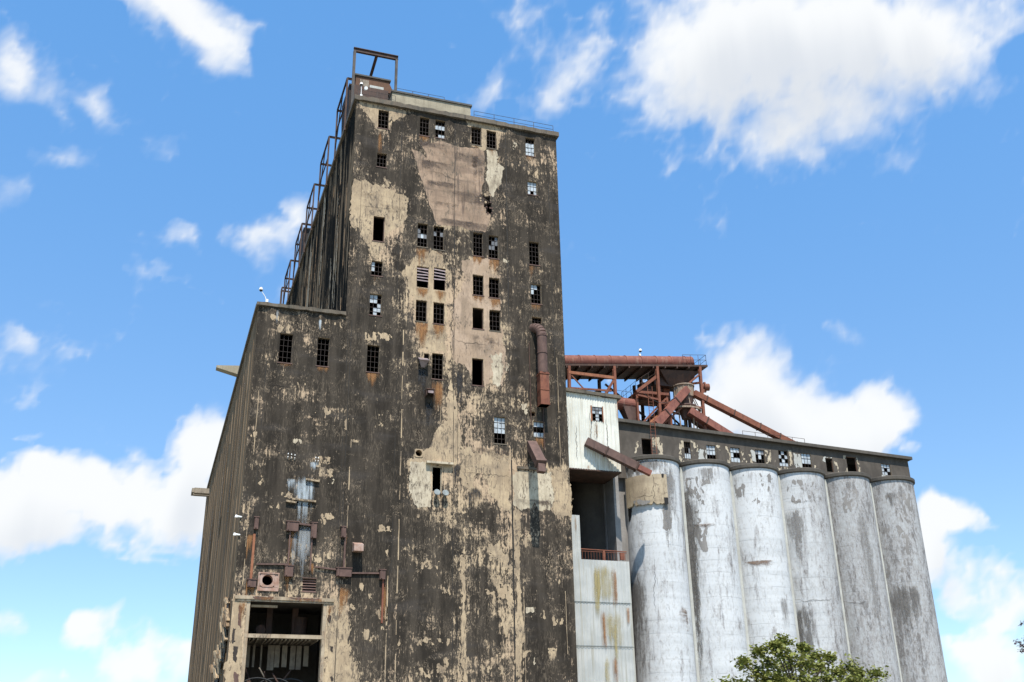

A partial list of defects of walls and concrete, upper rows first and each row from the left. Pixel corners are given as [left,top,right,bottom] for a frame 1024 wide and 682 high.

peeling [411,121,504,232]
peeling [306,178,409,309]
peeling [407,380,572,682]
peeling [635,437,663,455]
peeling [679,441,860,552]
leakage [787,513,803,546]
peeling [209,597,243,682]
corrosion [594,568,629,679]
leakage [782,602,813,652]
leakage [890,587,919,623]